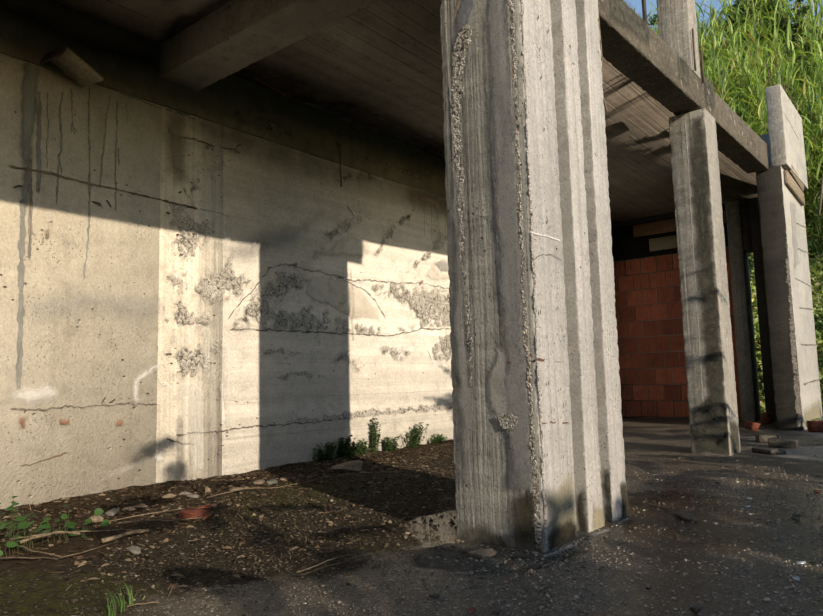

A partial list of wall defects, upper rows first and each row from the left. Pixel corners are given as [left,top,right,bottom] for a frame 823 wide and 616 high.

water stain [16,63,77,398]
crack [10,165,197,209]
water stain [83,88,128,277]
crack [229,17,505,516]
crack [11,402,158,411]
crack [166,402,453,445]